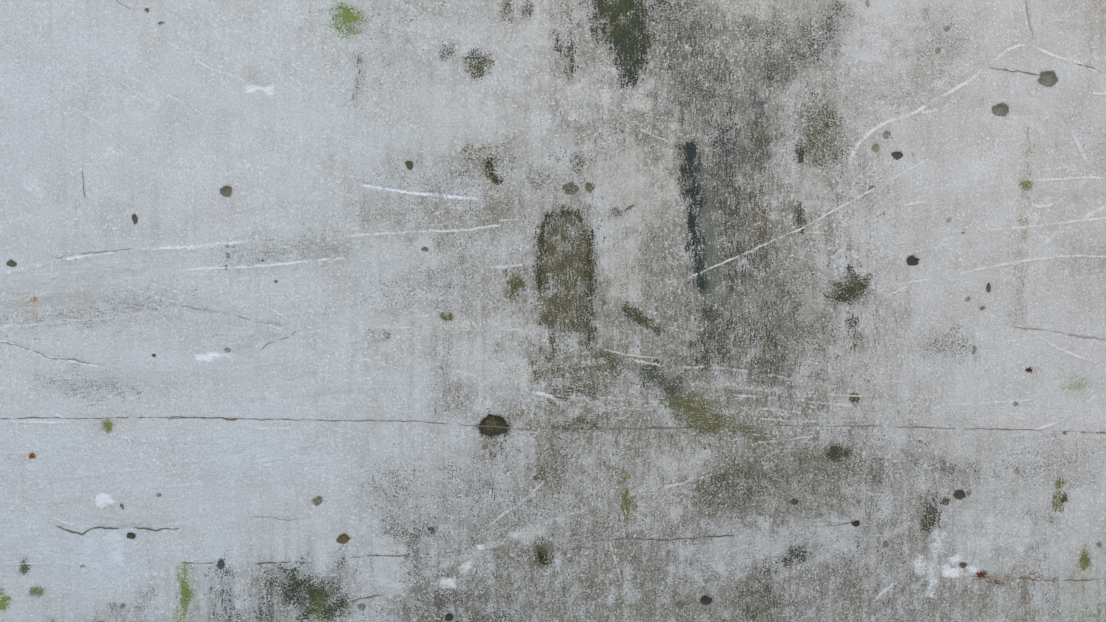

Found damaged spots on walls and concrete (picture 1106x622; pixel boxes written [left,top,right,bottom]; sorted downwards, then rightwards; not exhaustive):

leakage [598,0,1105,622]
crack [169,415,237,423]
leakage [354,203,629,622]
crack [55,525,180,535]
leakage [93,575,159,622]
leakage [203,550,292,622]